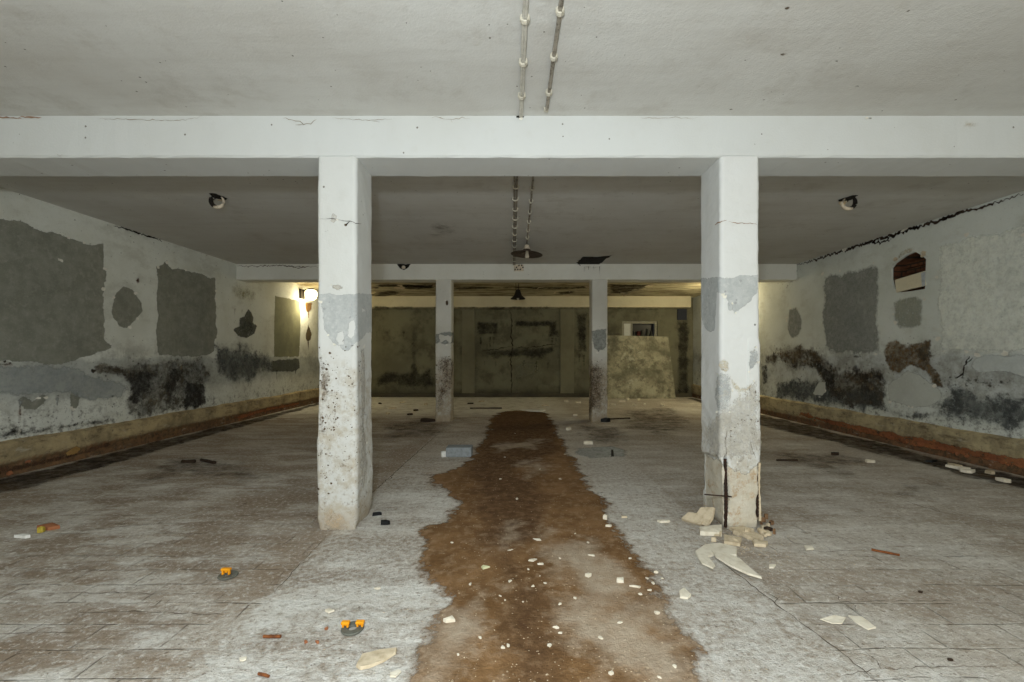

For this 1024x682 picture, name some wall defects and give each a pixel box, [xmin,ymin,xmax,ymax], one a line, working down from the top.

crack [799,193,1023,265]
peeling [0,219,142,365]
leakage [4,309,300,436]
peeling [318,284,412,431]
leakage [378,364,432,387]
leakage [478,321,558,364]
leakage [678,322,689,393]
peeling [701,275,758,332]
peeling [821,262,878,355]
leakage [762,338,1024,431]
peeling [892,249,926,327]
spalling [704,346,762,529]